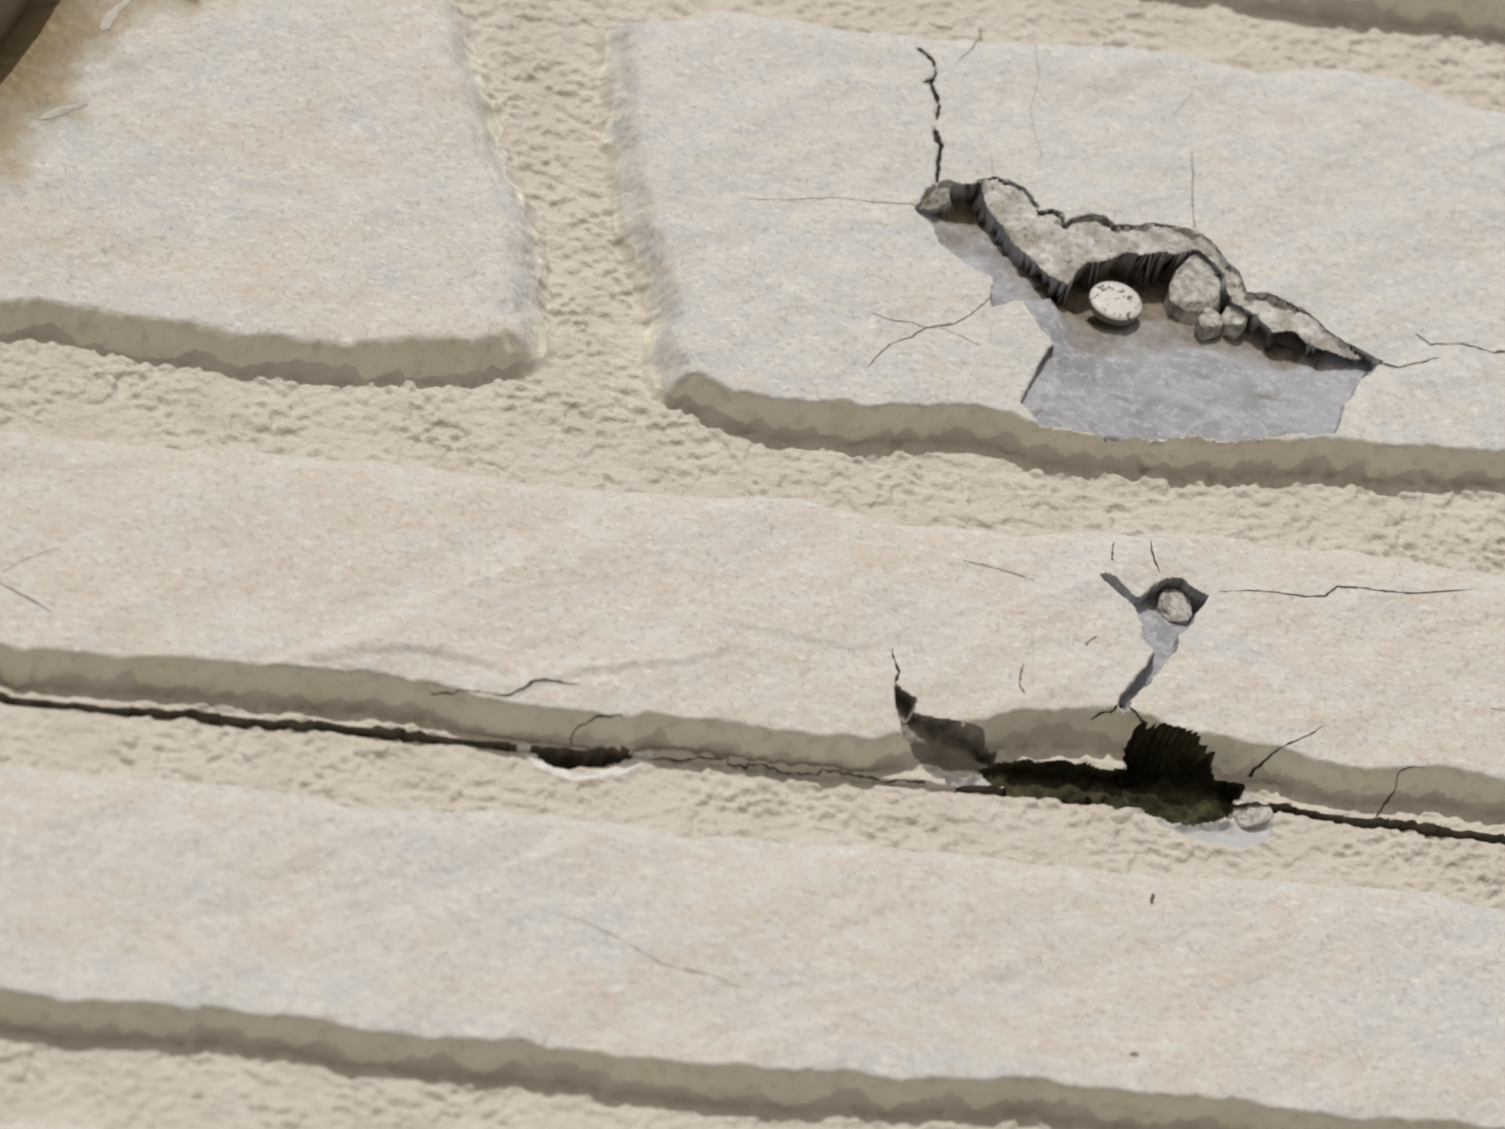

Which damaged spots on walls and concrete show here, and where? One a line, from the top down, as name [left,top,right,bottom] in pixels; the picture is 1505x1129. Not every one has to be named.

crack [746,23,982,205]
spalling [915,176,1385,444]
crack [1383,333,1505,368]
crack [1220,585,1468,597]
crack [431,678,579,696]
crack [892,649,900,682]
spalling [1100,572,1209,711]
crack [570,714,623,745]
spalling [894,683,1274,849]
crack [1091,703,1145,725]
crack [1248,726,1322,777]
crack [1373,766,1425,823]